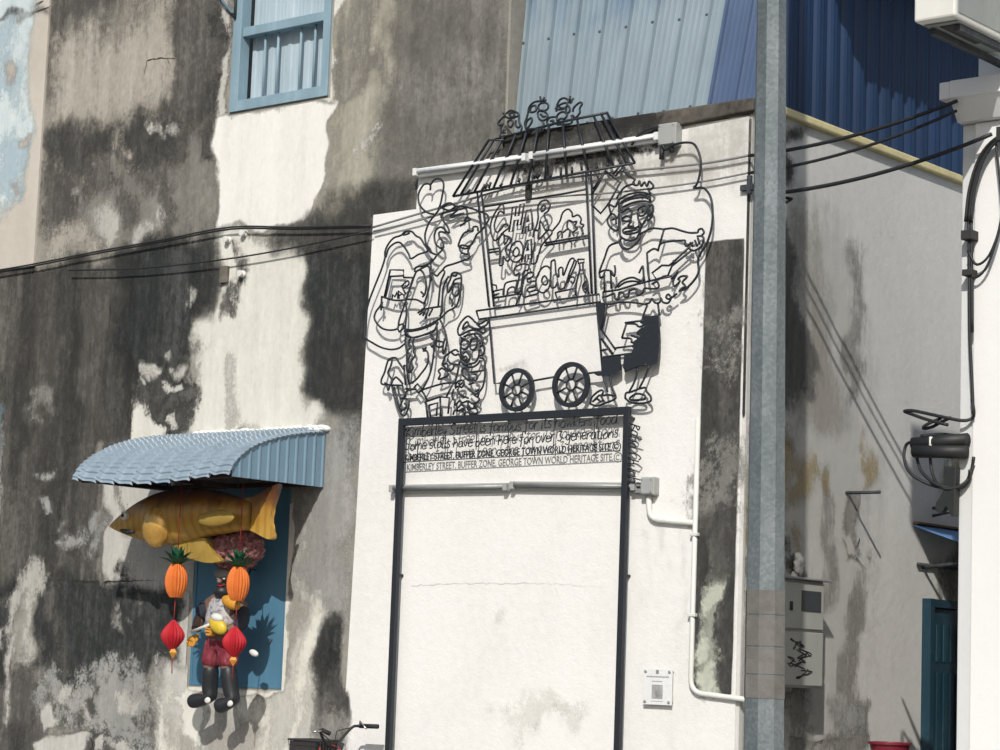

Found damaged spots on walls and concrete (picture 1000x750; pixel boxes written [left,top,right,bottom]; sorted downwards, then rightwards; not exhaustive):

peeling [0,0,36,212]
water stain [786,127,807,185]
water stain [0,0,232,750]
water stain [742,194,750,417]
water stain [785,218,843,429]
water stain [841,247,866,398]
water stain [785,536,807,577]
water stain [821,467,838,612]